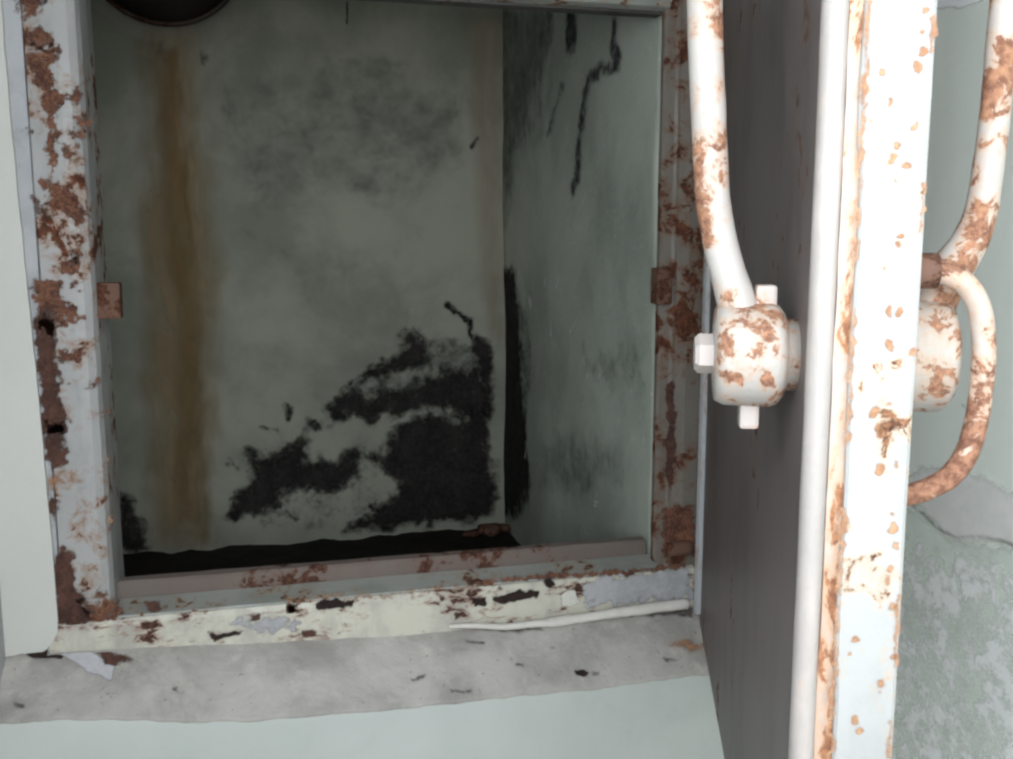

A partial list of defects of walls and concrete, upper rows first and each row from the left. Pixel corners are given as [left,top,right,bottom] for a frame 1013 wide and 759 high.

corrosion [15,0,92,520]
corrosion [54,546,124,625]
corrosion [145,601,162,612]
corrosion [208,592,372,642]
damp [226,268,530,533]
corrosion [435,381,696,619]
peeling [449,590,689,630]
peeling [891,474,1013,759]